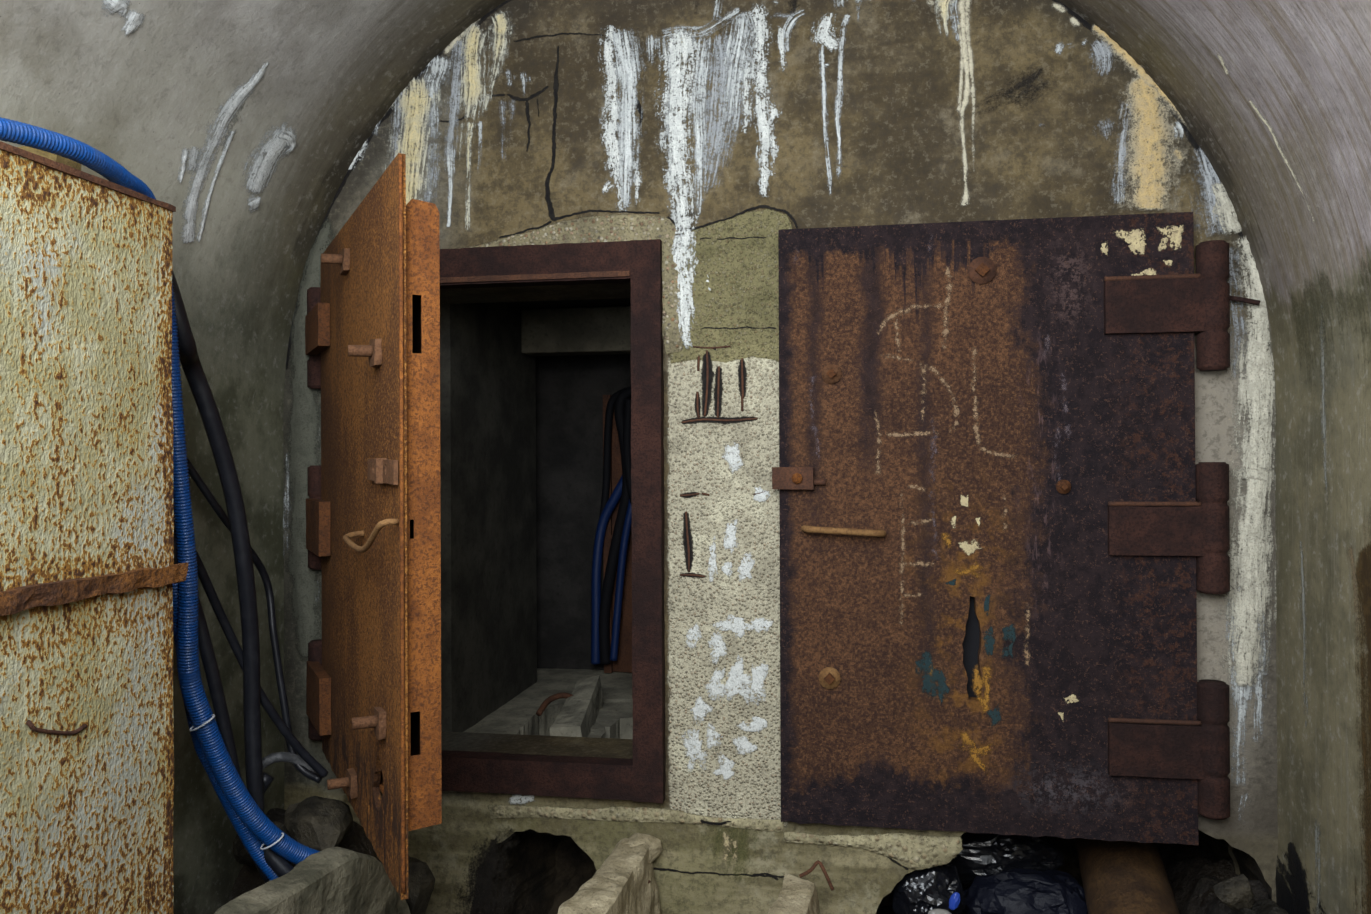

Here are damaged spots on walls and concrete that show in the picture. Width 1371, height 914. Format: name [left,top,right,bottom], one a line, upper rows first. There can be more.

water stain [177,62,268,243]
crack [286,0,512,369]
water stain [348,11,531,230]
crack [436,33,798,240]
water stain [599,0,862,349]
water stain [927,0,1048,205]
crack [1052,0,1244,248]
crack [702,323,776,331]
water stain [1053,4,1277,809]
rust [958,732,992,775]
rust [973,665,992,711]
rust [1349,531,1371,914]